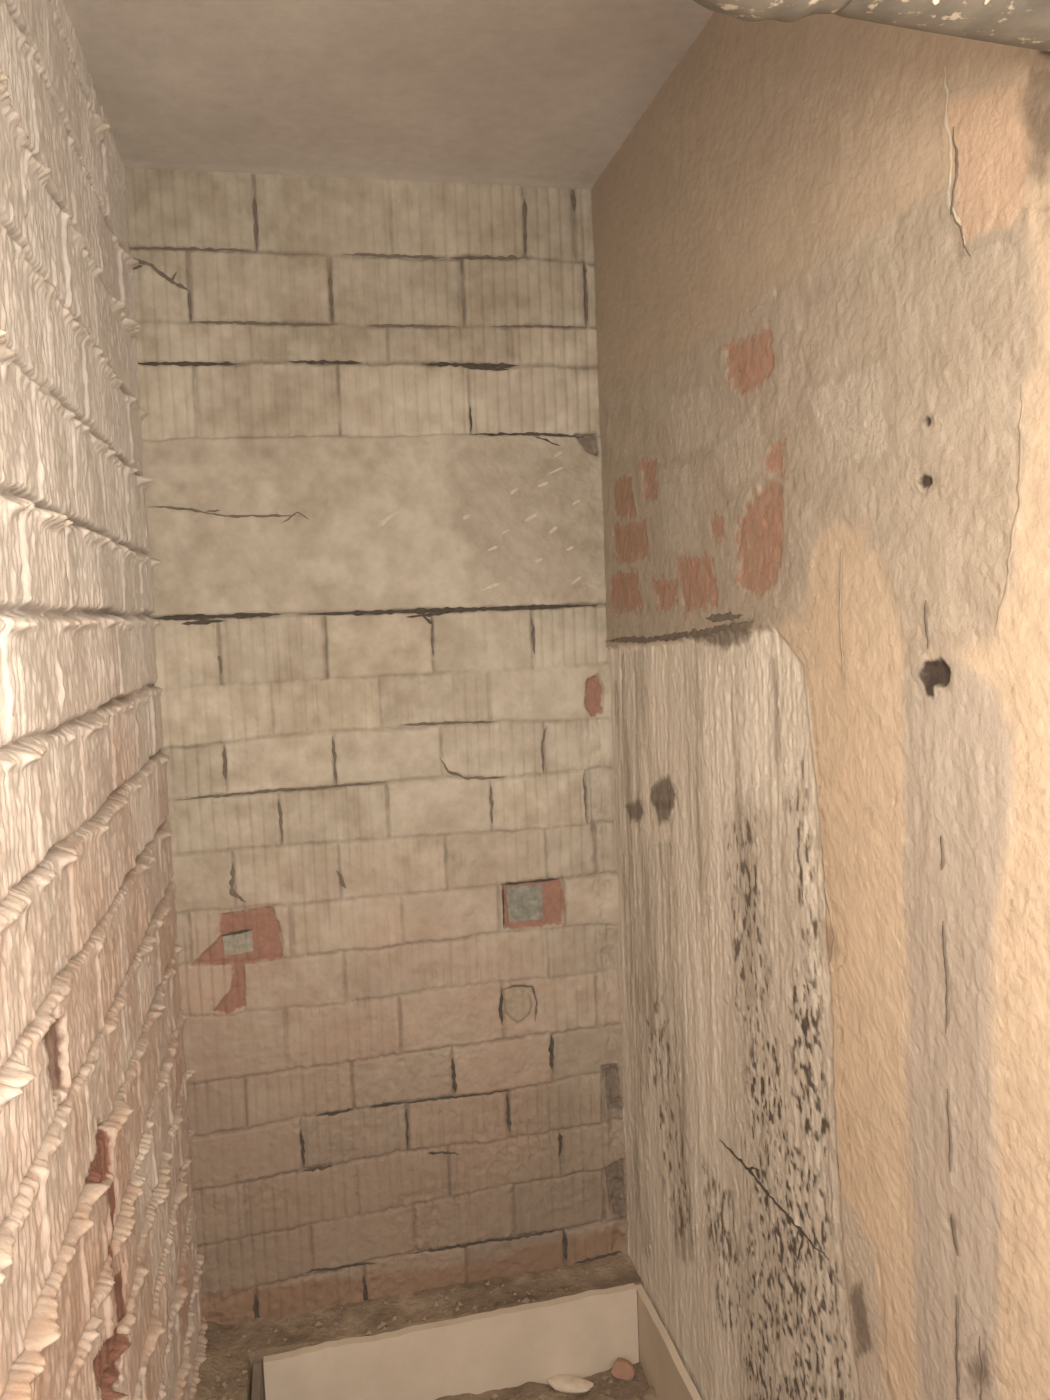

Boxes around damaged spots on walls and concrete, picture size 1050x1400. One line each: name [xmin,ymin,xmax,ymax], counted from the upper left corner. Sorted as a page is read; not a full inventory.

crack [133,195,527,328]
crack [138,359,237,367]
crack [422,362,519,371]
spalling [717,304,782,415]
spalling [606,417,797,632]
crack [153,604,597,674]
crack [606,611,754,644]
spalling [582,671,607,722]
crack [183,737,387,841]
spalling [498,875,568,932]
spalling [187,903,287,1018]
leakage [201,599,861,1400]